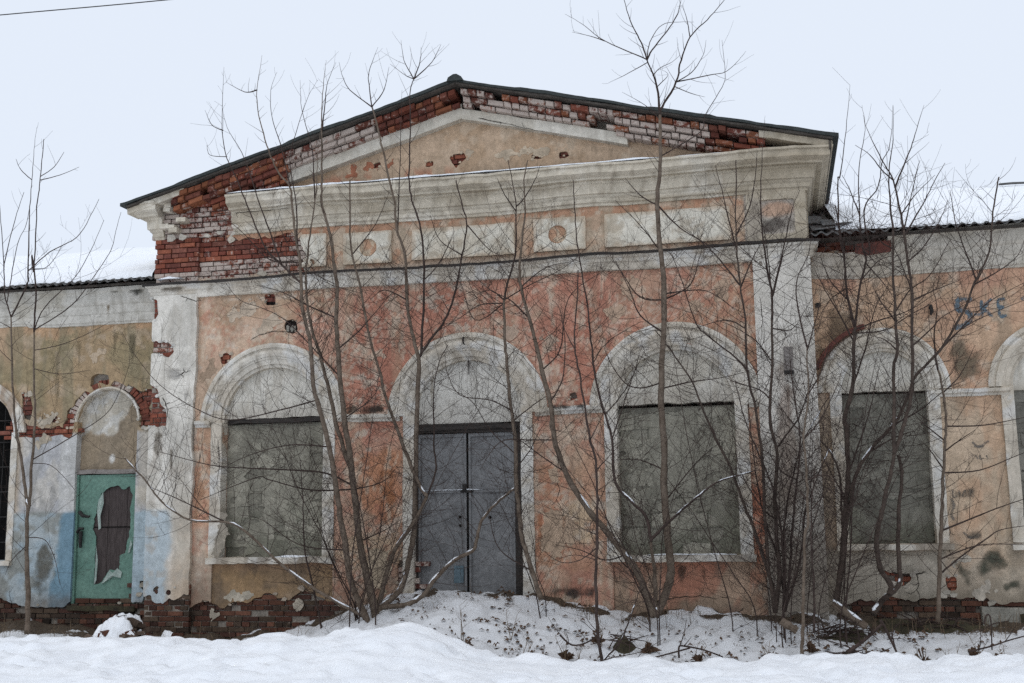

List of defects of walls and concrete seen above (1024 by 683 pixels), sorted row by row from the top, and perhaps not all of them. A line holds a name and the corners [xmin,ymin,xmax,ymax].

flaking render [152,88,766,283]
flaking render [153,340,176,357]
peeling [199,352,233,383]
damp [951,342,979,379]
flaking render [0,379,167,450]
damp [36,545,51,587]
damp [981,552,1006,574]
flaking render [0,581,347,639]
flaking render [837,555,1024,624]